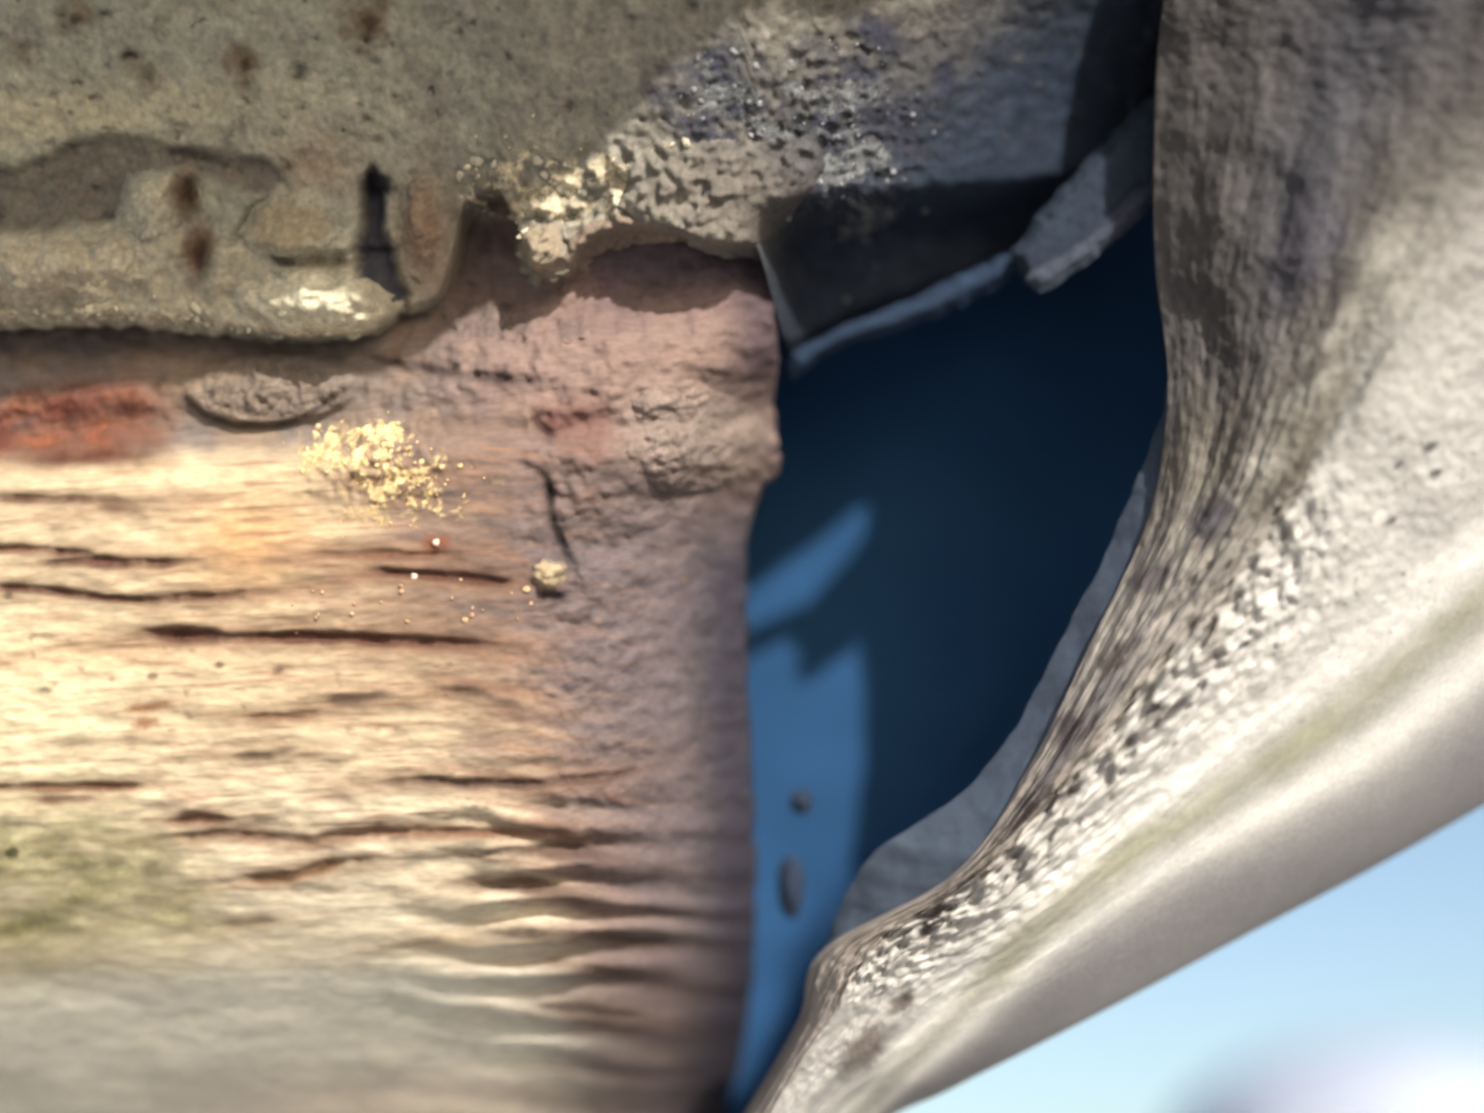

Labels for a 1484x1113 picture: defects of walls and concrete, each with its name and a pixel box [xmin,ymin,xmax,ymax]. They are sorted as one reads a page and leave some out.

water stain [650,17,949,242]
spalling [0,137,282,229]
spalling [367,171,390,192]
efflorescence [456,135,631,258]
peeling [563,119,826,276]
rust [0,387,150,462]
water stain [1138,564,1169,588]
water stain [1058,713,1080,743]
water stain [893,989,913,1009]
water stain [845,1029,882,1071]